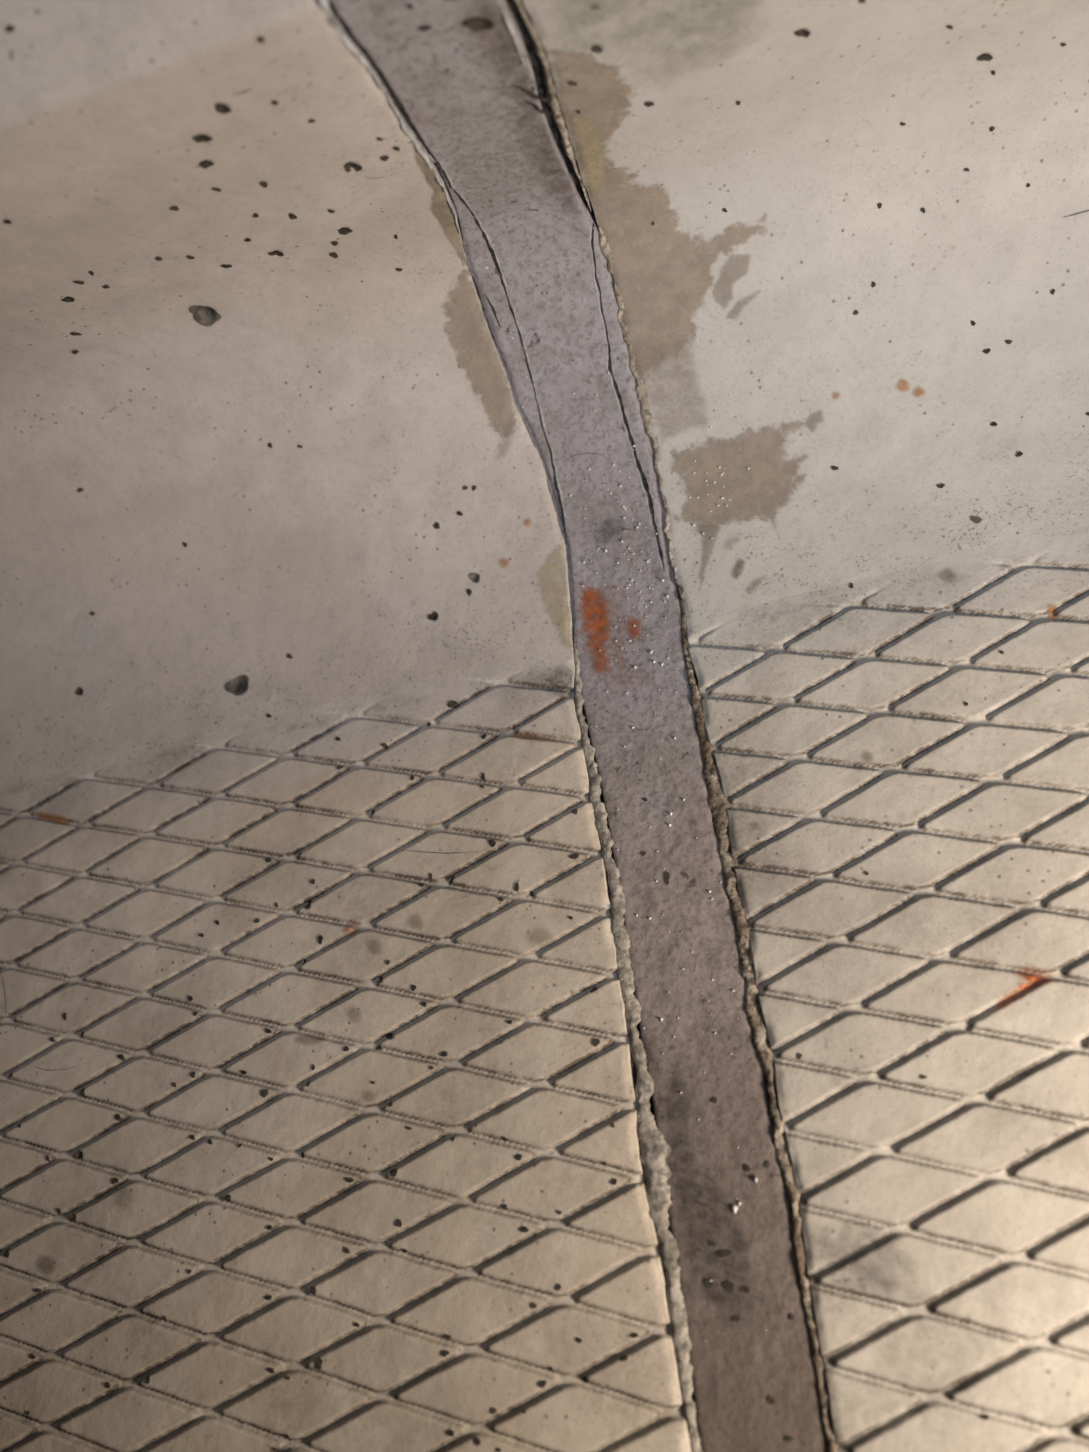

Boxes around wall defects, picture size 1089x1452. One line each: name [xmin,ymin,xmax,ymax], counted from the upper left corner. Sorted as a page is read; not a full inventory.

damp [445,271,514,435]
crack [328,0,665,572]
damp [549,51,764,376]
damp [673,412,821,574]
corrosion [583,589,608,669]
corrosion [1000,973,1048,1004]